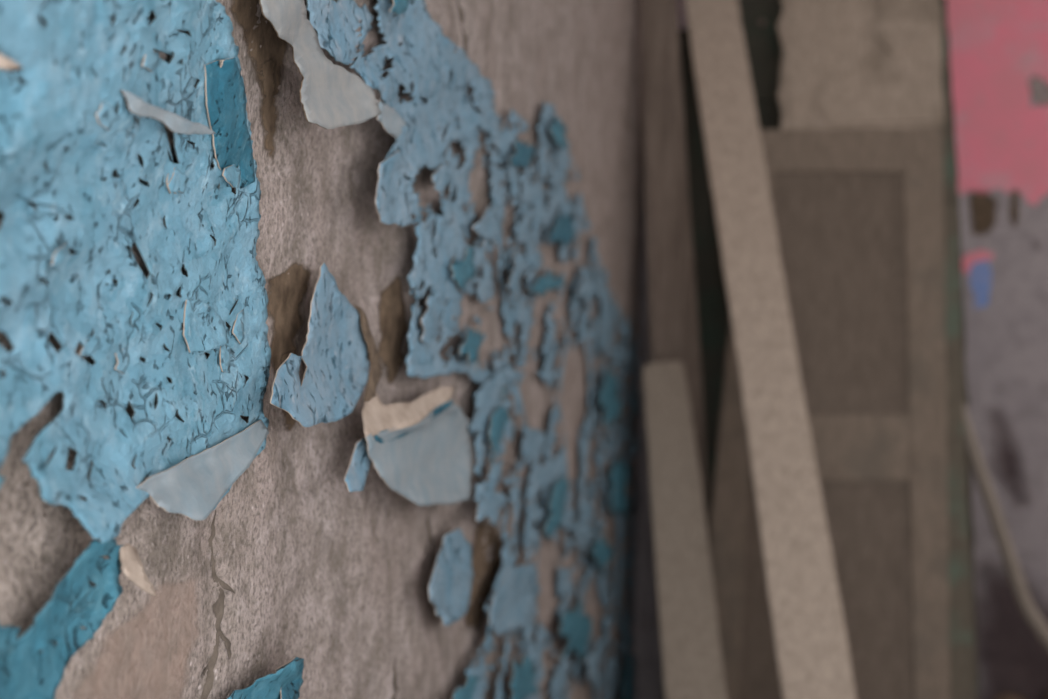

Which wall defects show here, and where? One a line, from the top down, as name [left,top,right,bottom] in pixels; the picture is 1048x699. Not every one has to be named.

peeling [946,0,1048,235]
peeling [0,0,641,699]
crack [201,510,235,699]